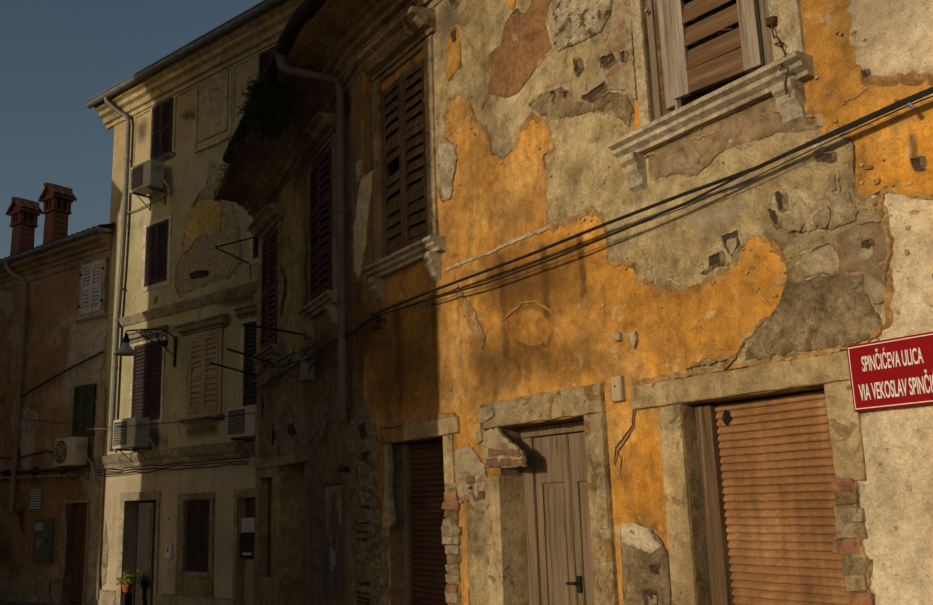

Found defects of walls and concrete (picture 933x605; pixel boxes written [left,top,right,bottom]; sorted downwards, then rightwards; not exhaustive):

flaking render [174,159,244,298]
flaking render [421,0,933,386]
flaking render [0,397,40,470]
flaking render [441,407,527,605]
flaking render [619,522,684,605]
flaking render [828,404,933,605]